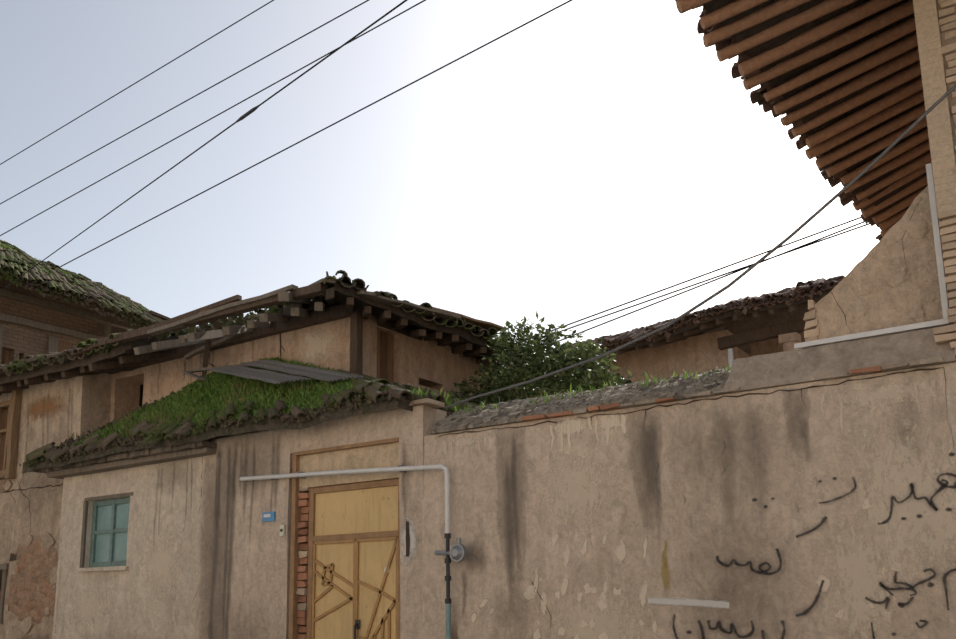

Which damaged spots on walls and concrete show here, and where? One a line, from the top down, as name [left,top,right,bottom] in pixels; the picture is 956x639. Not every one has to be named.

spalling [4,533,58,639]